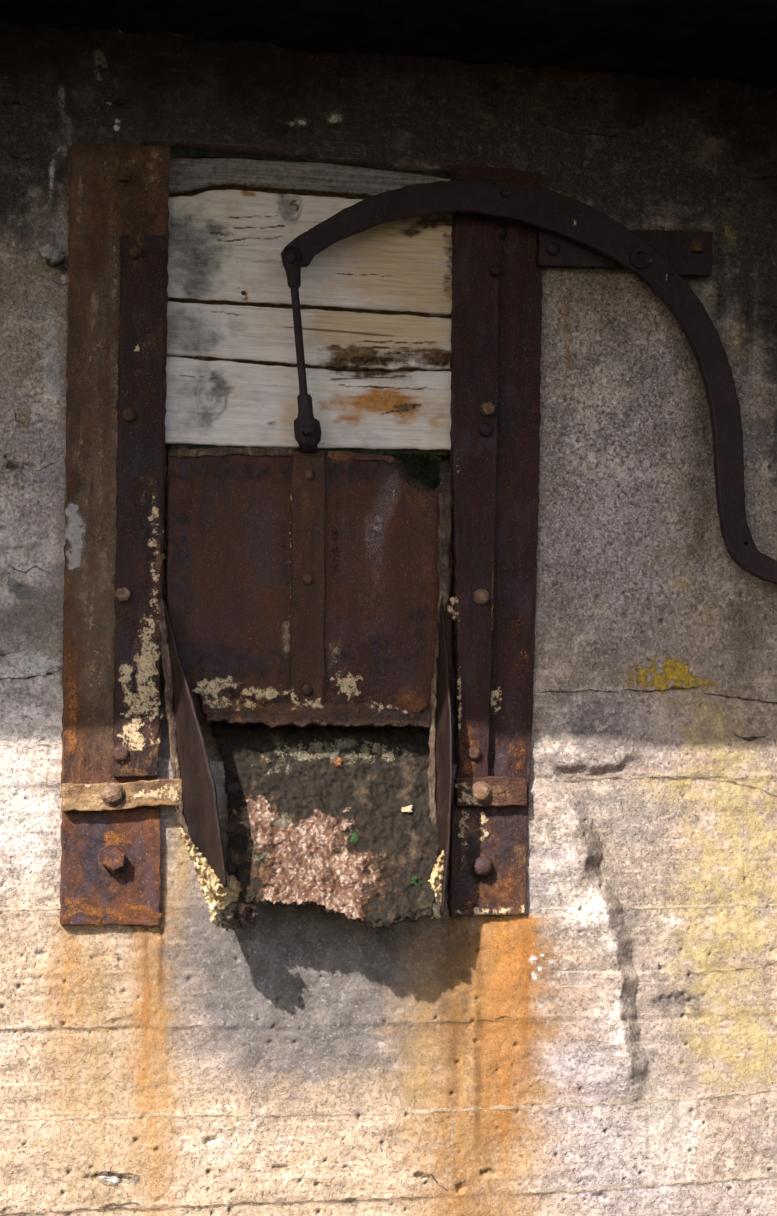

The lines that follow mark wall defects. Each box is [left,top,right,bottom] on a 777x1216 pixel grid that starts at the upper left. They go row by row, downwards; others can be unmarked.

crack [539,686,777,704]
crack [732,730,769,741]
peeling [232,794,376,921]
rust [133,909,170,1148]
leakage [165,900,406,1086]
rust [417,914,536,1216]